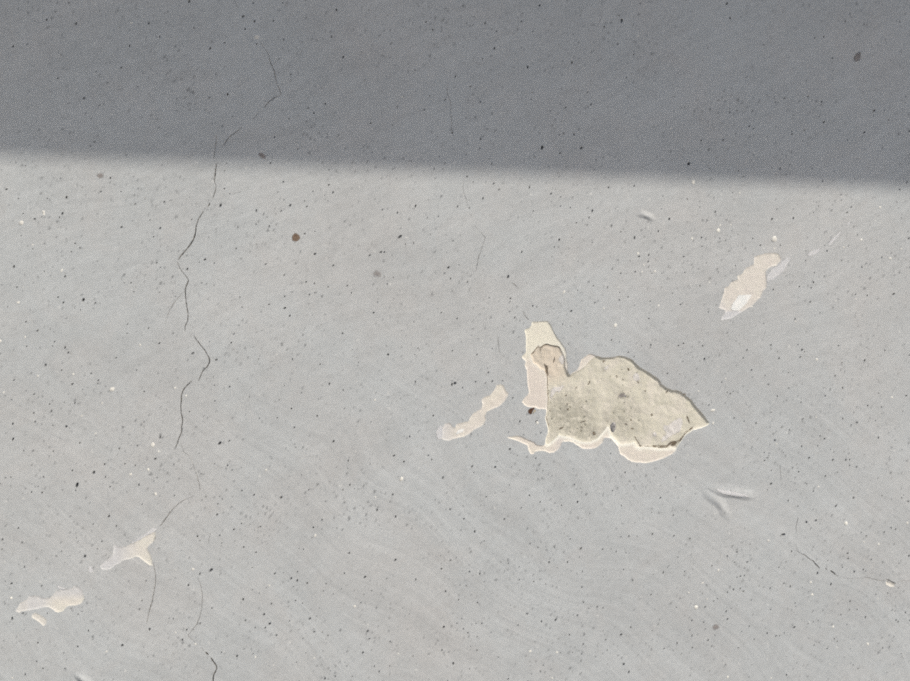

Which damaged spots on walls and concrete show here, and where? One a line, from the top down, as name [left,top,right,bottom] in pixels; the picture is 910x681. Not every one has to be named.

peeling [719,253,790,320]
crack [146,41,281,624]
peeling [436,384,509,440]
spalling [507,321,710,463]
peeling [88,528,156,573]
peeling [16,585,84,626]
crack [188,579,217,681]